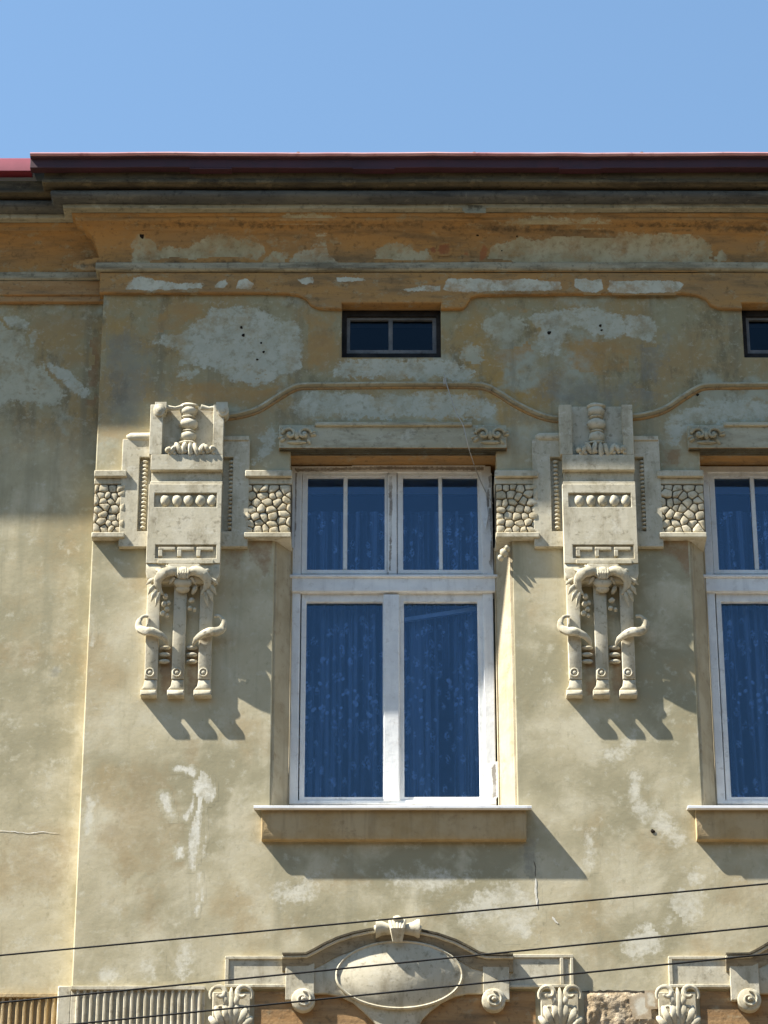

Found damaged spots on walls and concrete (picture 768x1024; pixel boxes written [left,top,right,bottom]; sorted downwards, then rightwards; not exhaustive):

peeling [0,308,94,415]
peeling [121,212,369,390]
peeling [250,212,731,470]
damp [0,729,219,946]